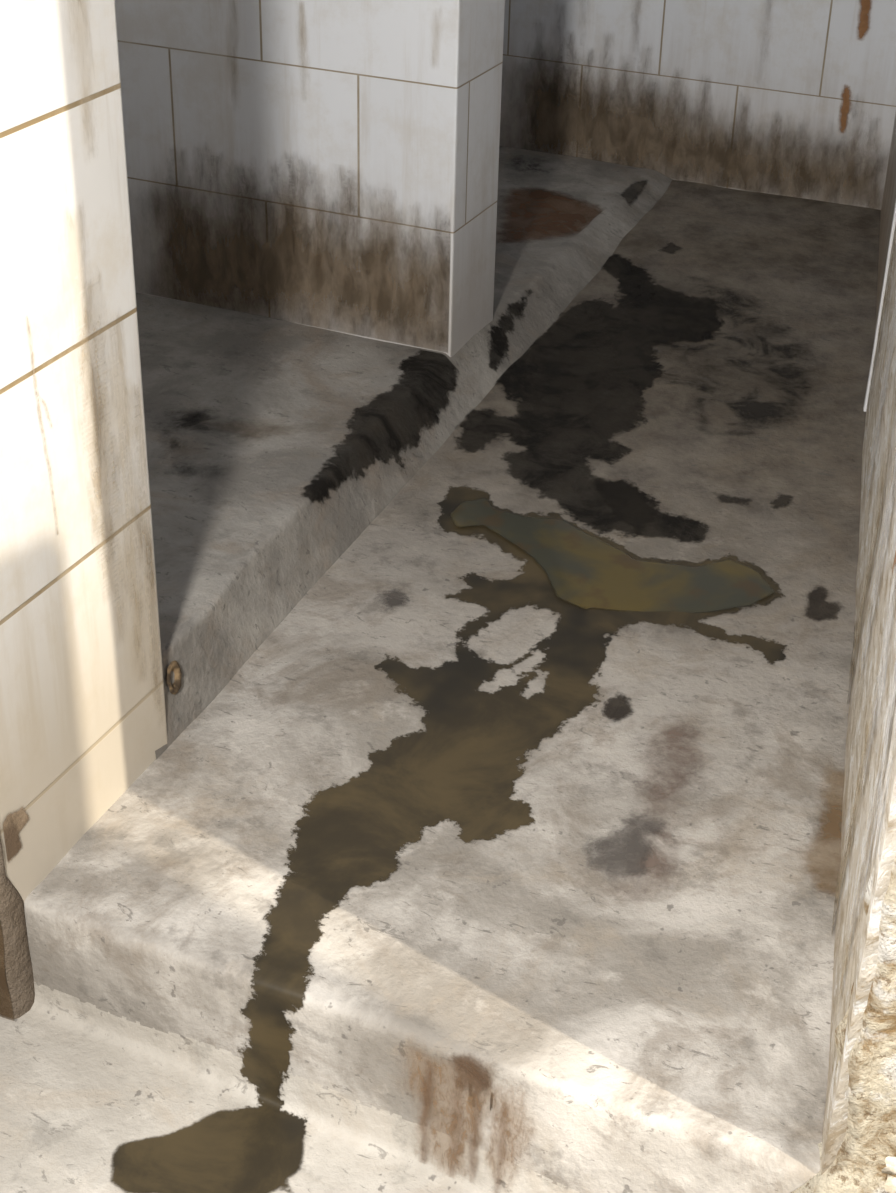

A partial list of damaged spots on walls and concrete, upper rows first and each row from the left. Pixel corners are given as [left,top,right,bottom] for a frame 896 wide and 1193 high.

corrosion [858,0,871,39]
damp [514,66,881,209]
corrosion [840,86,850,132]
damp [152,191,458,504]
damp [111,254,810,1193]
spalling [3,807,29,862]
corrosion [410,1052,490,1169]
corrosion [490,1101,523,1166]